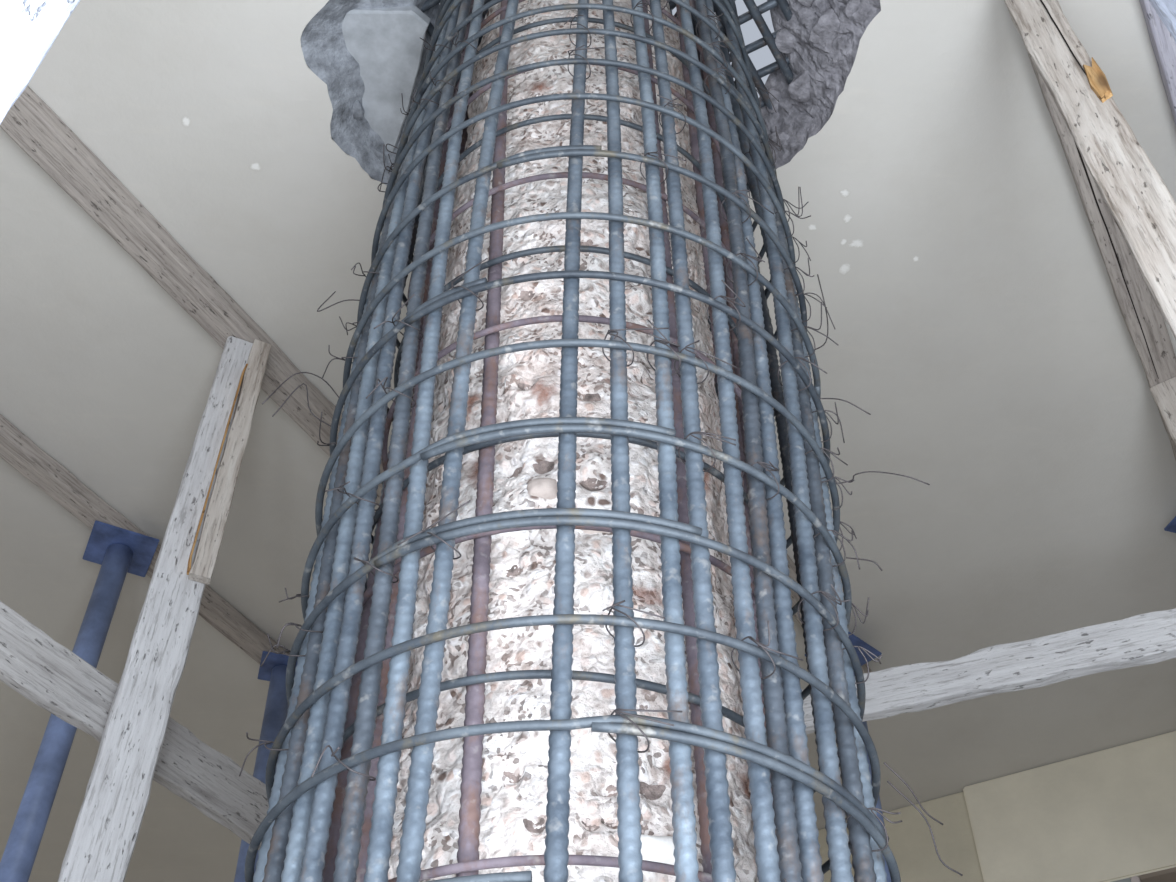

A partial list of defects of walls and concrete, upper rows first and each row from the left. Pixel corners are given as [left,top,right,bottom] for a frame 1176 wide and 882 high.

spalling [253,0,523,882]
spalling [518,291,535,301]
spalling [475,433,631,516]
spalling [559,0,881,819]
spalling [523,525,736,882]
spalling [746,760,887,882]